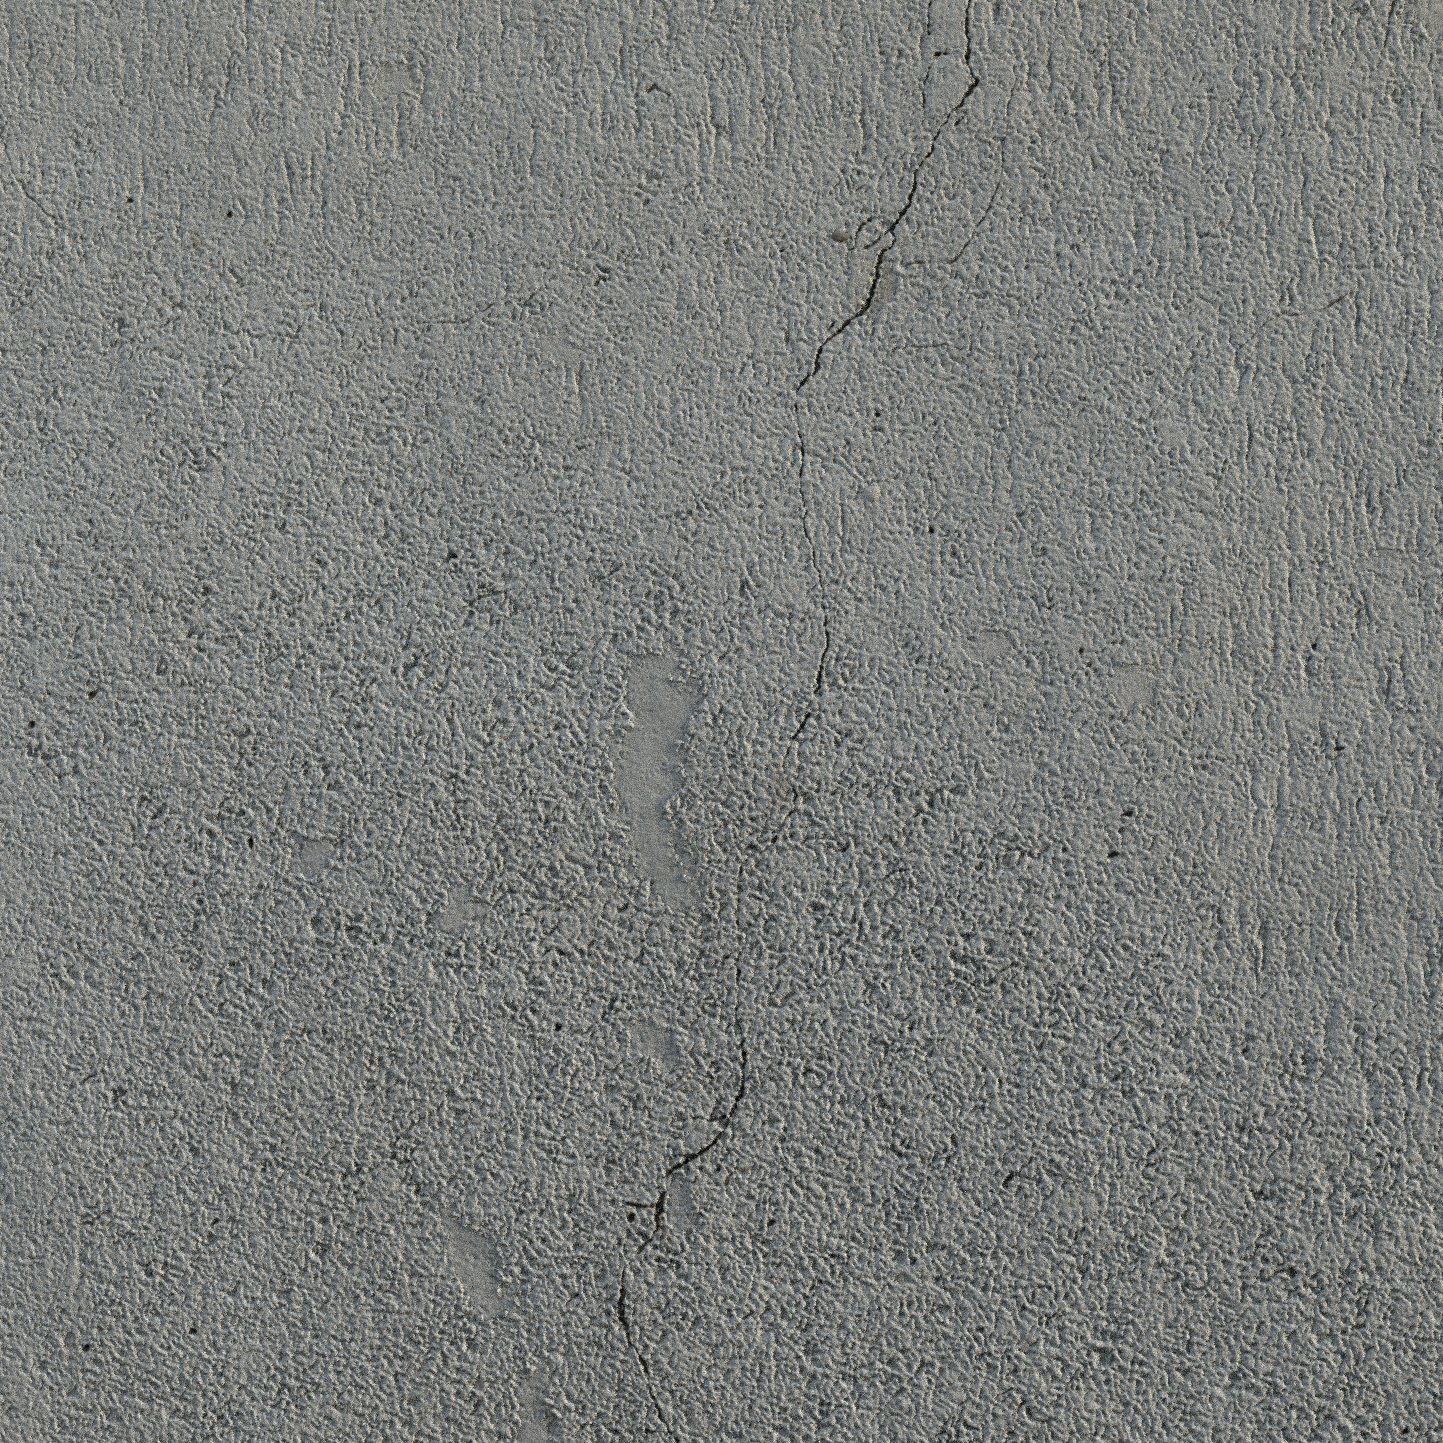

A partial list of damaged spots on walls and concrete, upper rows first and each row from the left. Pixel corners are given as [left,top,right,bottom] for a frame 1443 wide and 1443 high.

crack [646,84,670,102]
crack [736,0,1014,925]
crack [617,959,747,1443]